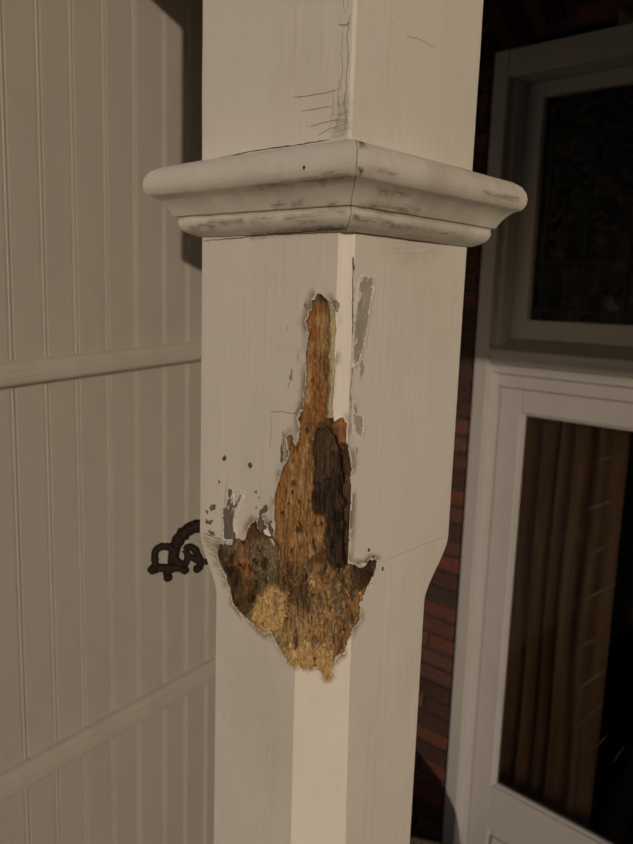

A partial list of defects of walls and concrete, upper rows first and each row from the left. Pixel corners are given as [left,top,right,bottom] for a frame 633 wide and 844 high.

peeling [351,257,376,380]
peeling [280,413,301,463]
peeling [205,481,245,545]
peeling [255,491,275,545]
spalling [312,394,384,615]